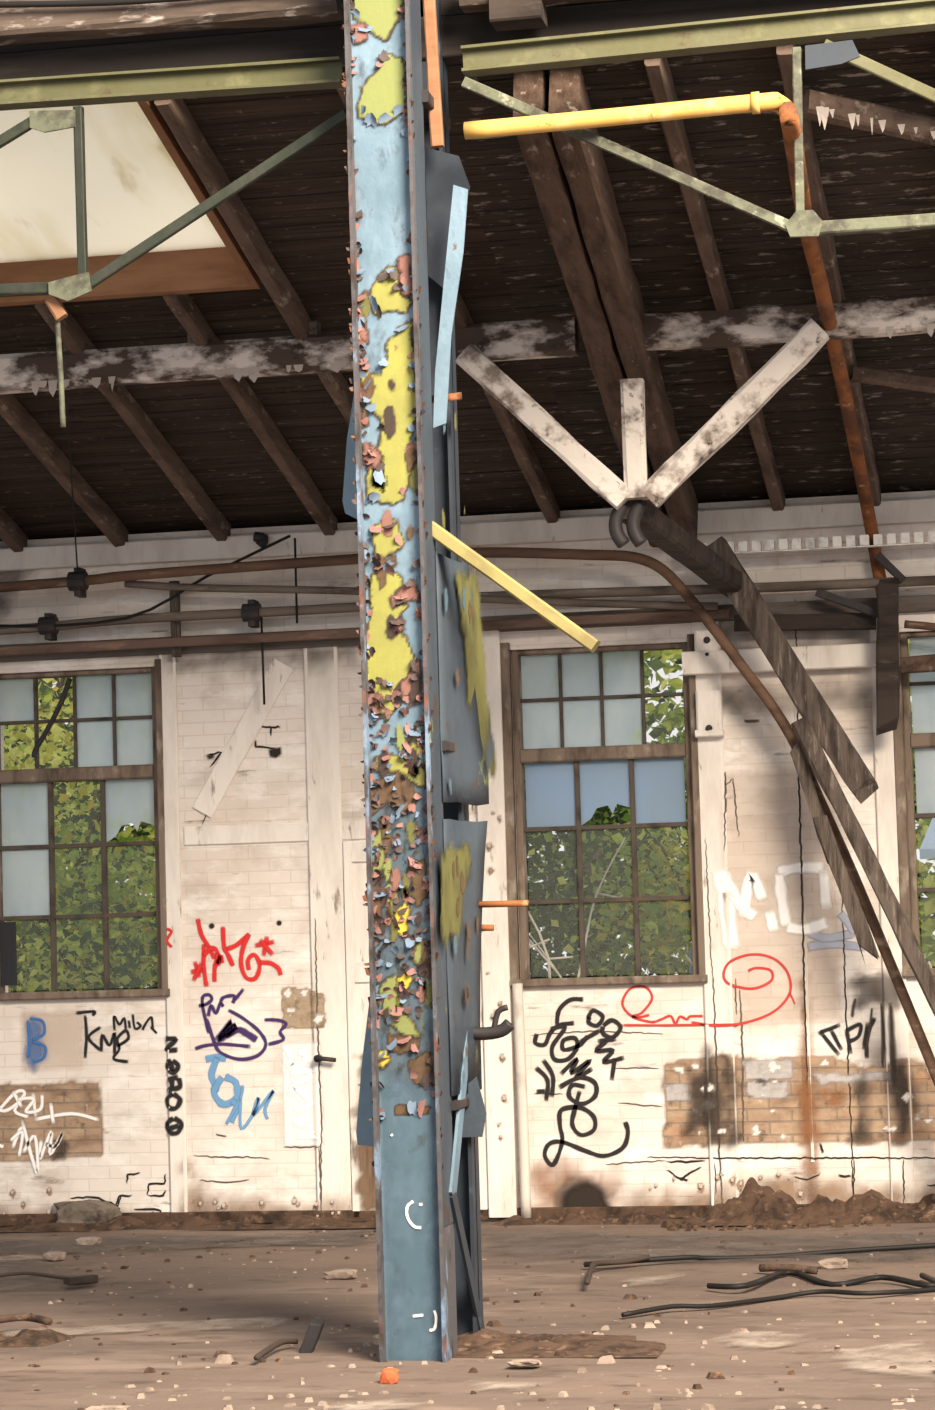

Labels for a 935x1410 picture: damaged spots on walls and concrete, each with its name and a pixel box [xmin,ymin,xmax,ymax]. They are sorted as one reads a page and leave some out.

peeling [341,0,415,180]
corrosion [778,101,812,212]
peeling [214,367,260,383]
corrosion [801,237,886,597]
peeling [330,204,496,1121]
water stain [851,999,896,1069]
flaking render [0,1081,103,1162]
flaking render [663,1055,935,1148]